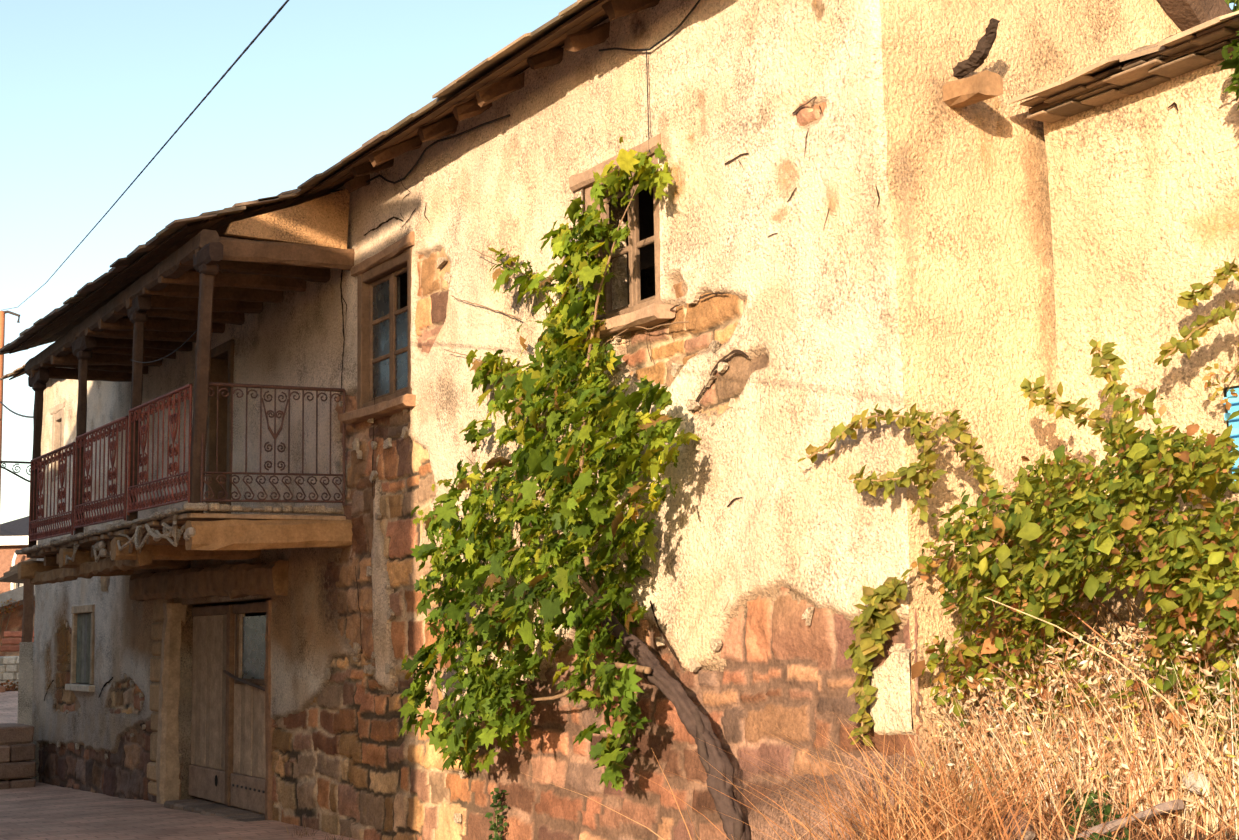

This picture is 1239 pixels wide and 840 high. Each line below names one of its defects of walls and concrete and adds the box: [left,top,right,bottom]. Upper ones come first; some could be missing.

flaking render [796,102,826,126]
flaking render [415,248,451,353]
flaking render [607,281,769,426]
flaking render [52,619,81,715]
flaking render [271,395,922,840]
flaking render [38,673,157,802]